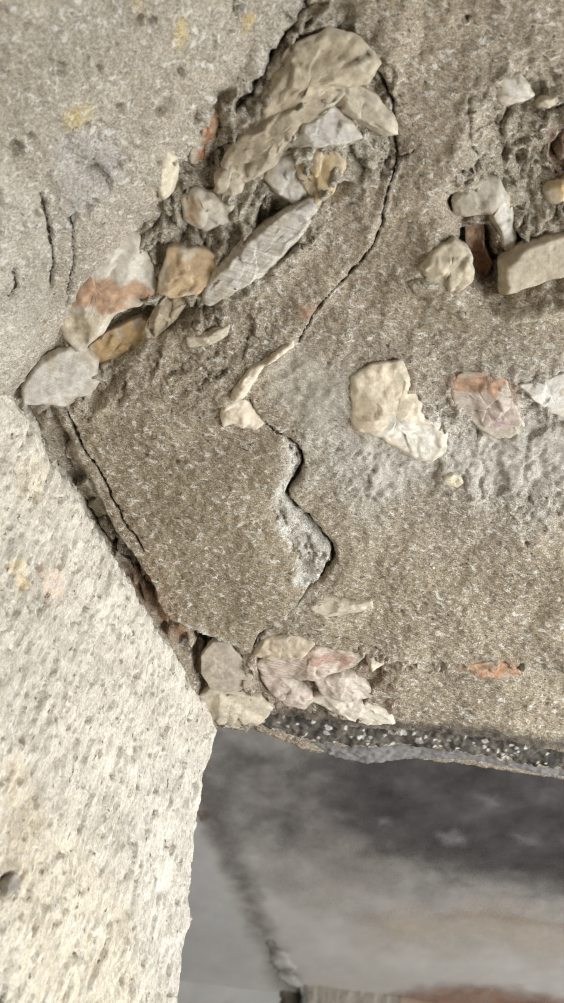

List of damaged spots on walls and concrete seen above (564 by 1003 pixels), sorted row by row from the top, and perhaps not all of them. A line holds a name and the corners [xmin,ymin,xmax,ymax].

spalling [102,0,347,340]
spalling [291,98,395,231]
crack [376,71,394,111]
spalling [463,64,564,243]
crack [299,135,415,339]
spalling [454,214,505,274]
crack [68,411,156,596]
crack [249,399,336,576]
crack [193,630,207,648]
spalling [192,635,213,690]
spalling [227,646,564,770]
peeling [266,940,399,1003]